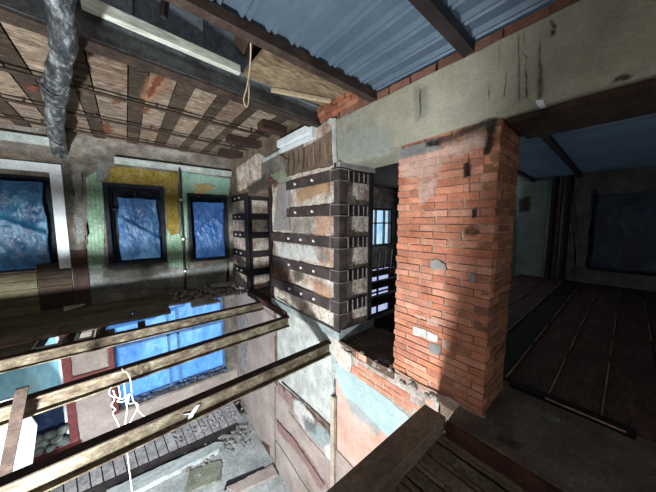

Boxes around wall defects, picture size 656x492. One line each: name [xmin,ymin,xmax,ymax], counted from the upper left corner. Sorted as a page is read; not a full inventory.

rust [0,7,47,37]
rust [78,36,320,128]
peeling [302,118,338,168]
peeling [236,152,290,195]
spalling [333,338,486,436]